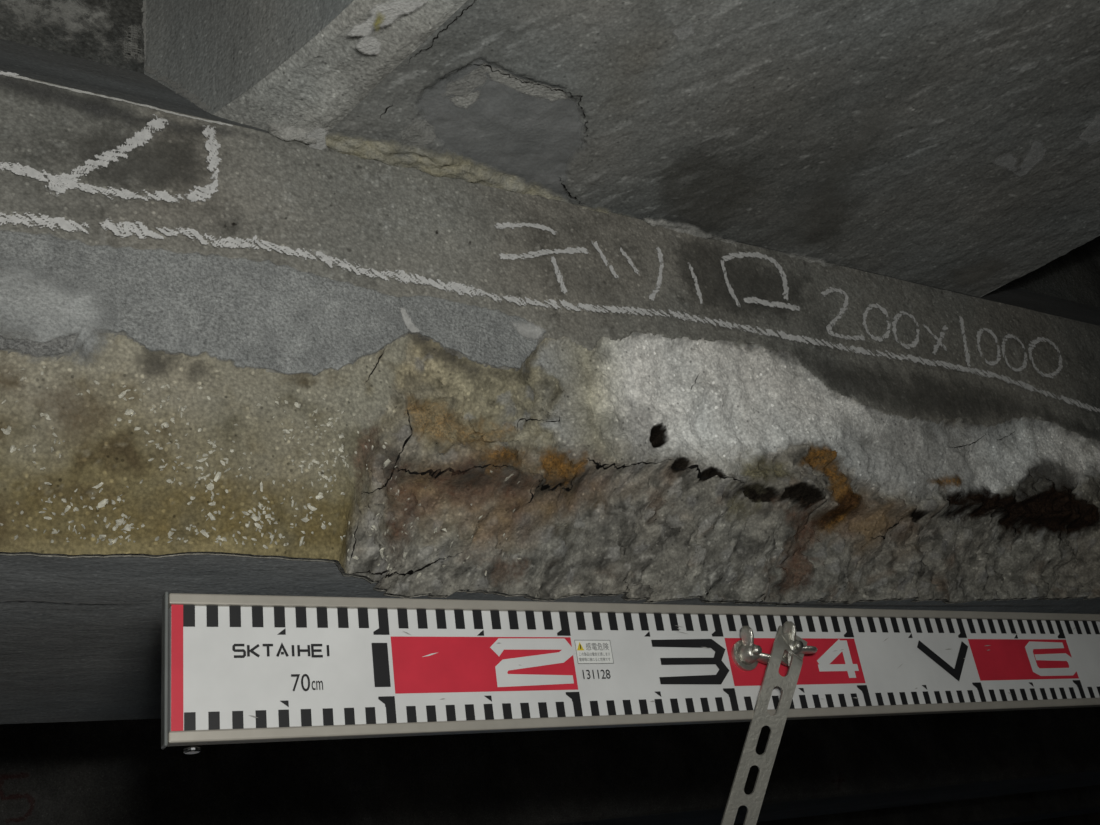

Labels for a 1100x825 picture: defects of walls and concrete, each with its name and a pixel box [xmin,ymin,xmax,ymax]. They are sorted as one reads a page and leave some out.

peeling [401,58,582,199]
crack [349,526,462,578]
spalling [0,308,1100,606]
crack [365,410,744,503]
rust [782,447,861,590]
rust [936,476,1100,541]